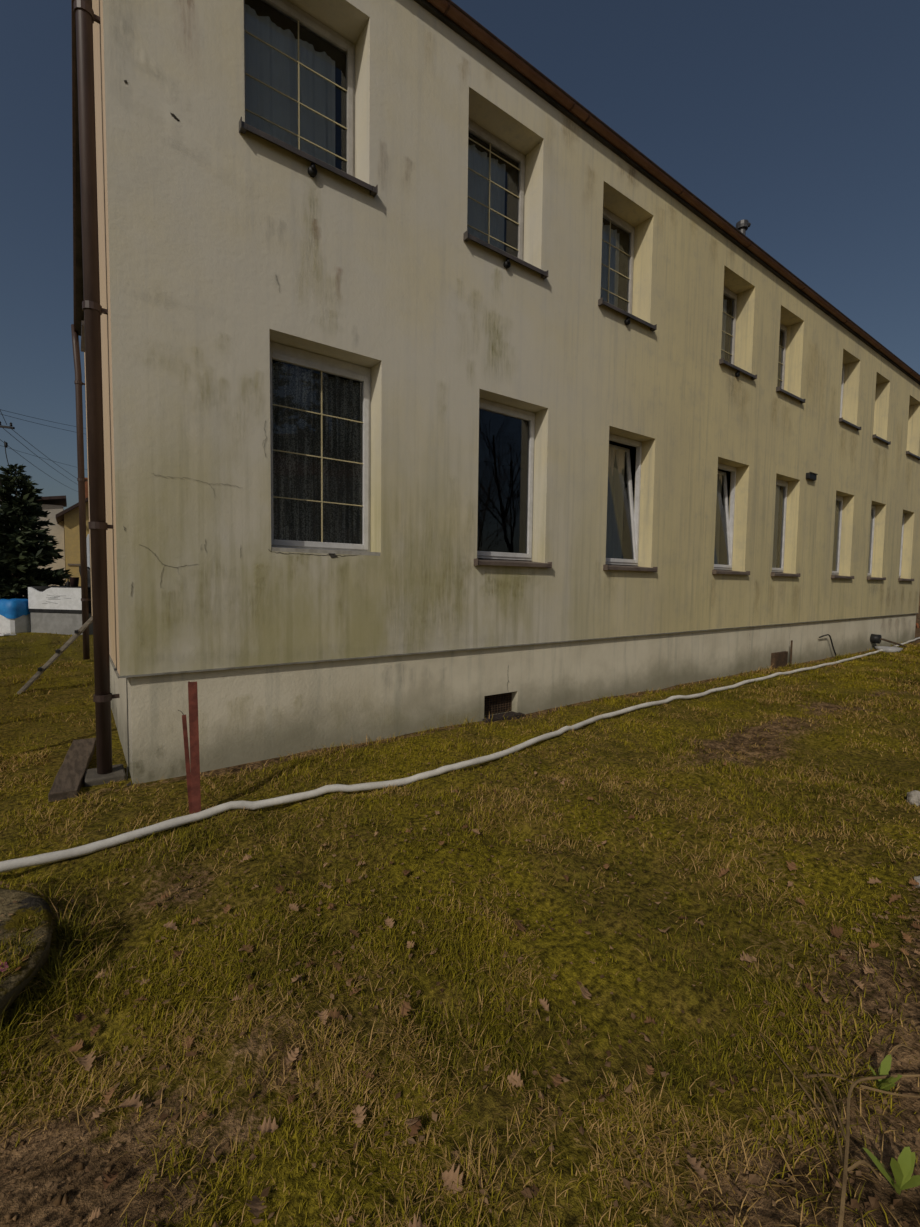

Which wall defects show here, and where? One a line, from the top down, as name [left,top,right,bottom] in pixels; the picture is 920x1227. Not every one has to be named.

crack [124,528,207,596]
crack [270,550,354,558]